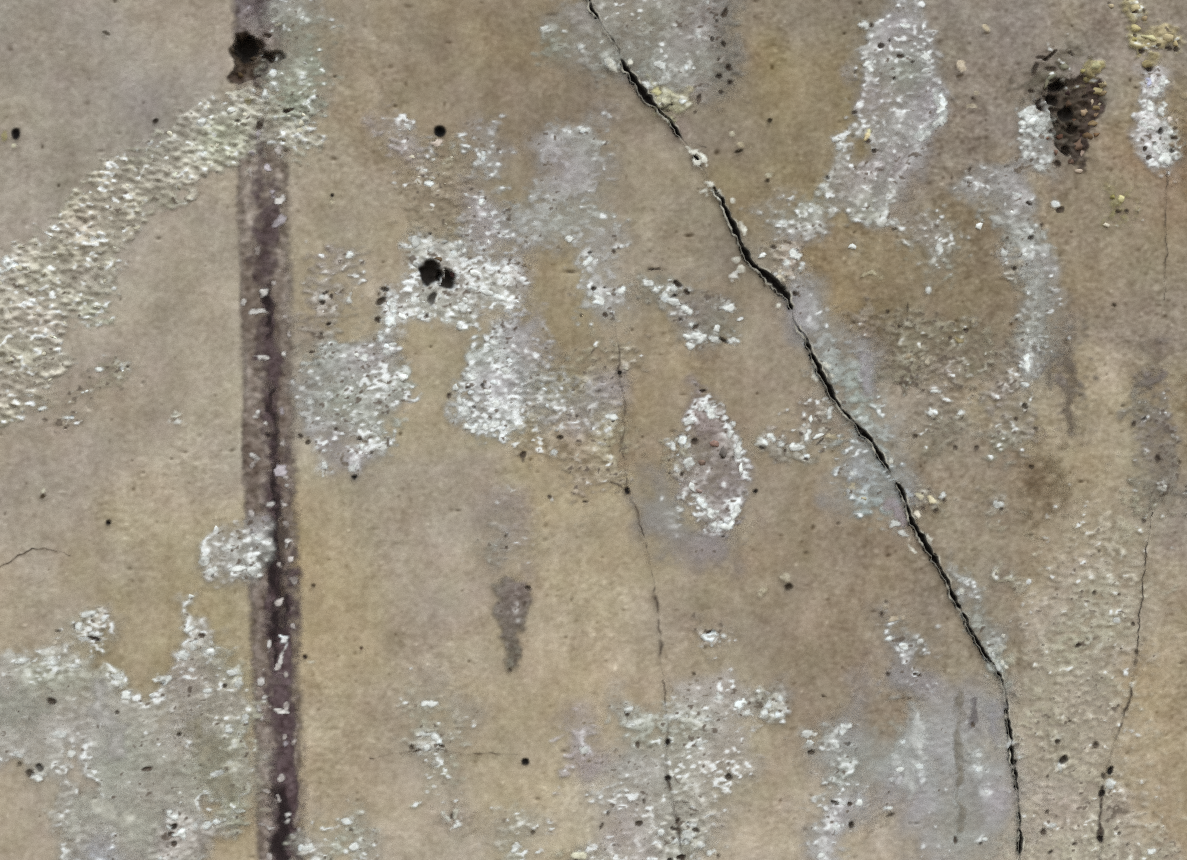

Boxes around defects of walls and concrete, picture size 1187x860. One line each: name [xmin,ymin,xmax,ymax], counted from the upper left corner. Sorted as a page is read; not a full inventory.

spalling [1018,47,1107,173]
spalling [1131,66,1181,177]
peeling [258,126,647,502]
spalling [660,380,844,538]
crack [588,0,1025,860]
peeling [199,502,293,582]
damp [492,577,532,672]
crack [1121,546,1147,726]
peeling [0,594,300,860]
spalling [754,685,789,723]
spalling [651,803,720,860]
crack [1097,767,1112,842]